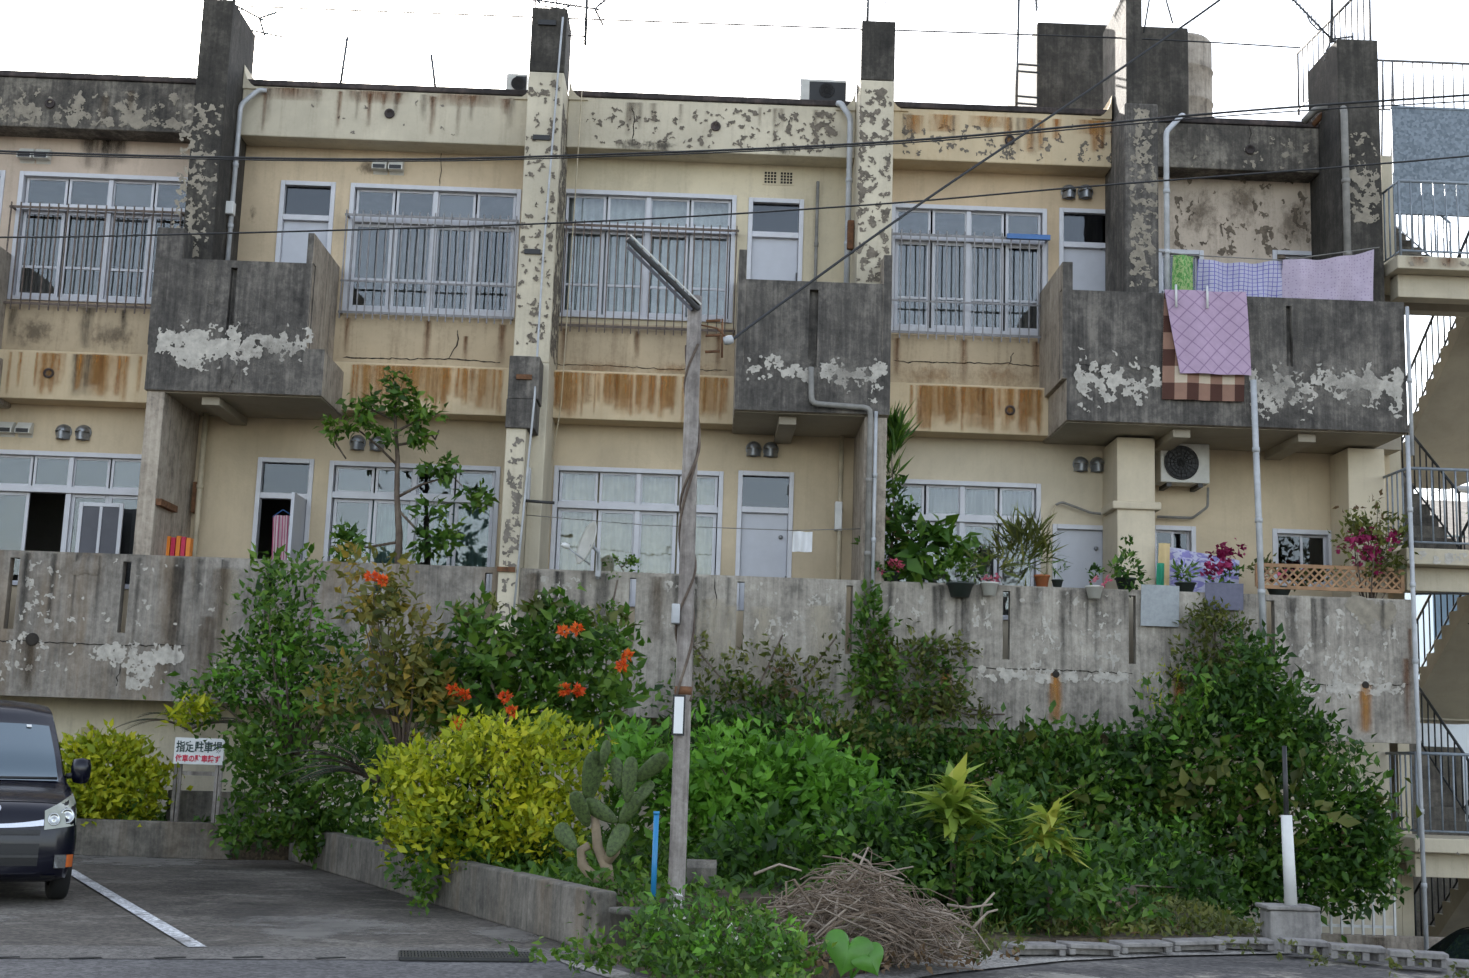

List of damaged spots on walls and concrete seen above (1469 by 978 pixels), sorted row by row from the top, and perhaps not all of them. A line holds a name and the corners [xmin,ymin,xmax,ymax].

peeling [0,87,224,257]
peeling [856,87,1159,287]
spalling [516,79,567,370]
corrosion [18,352,142,386]
peeling [155,319,313,375]
corrosion [351,365,502,403]
corrosion [555,372,684,408]
peeling [746,353,888,404]
corrosion [911,385,1041,427]
peeling [1074,347,1162,412]
peeling [1249,362,1404,421]
peeling [0,560,184,691]